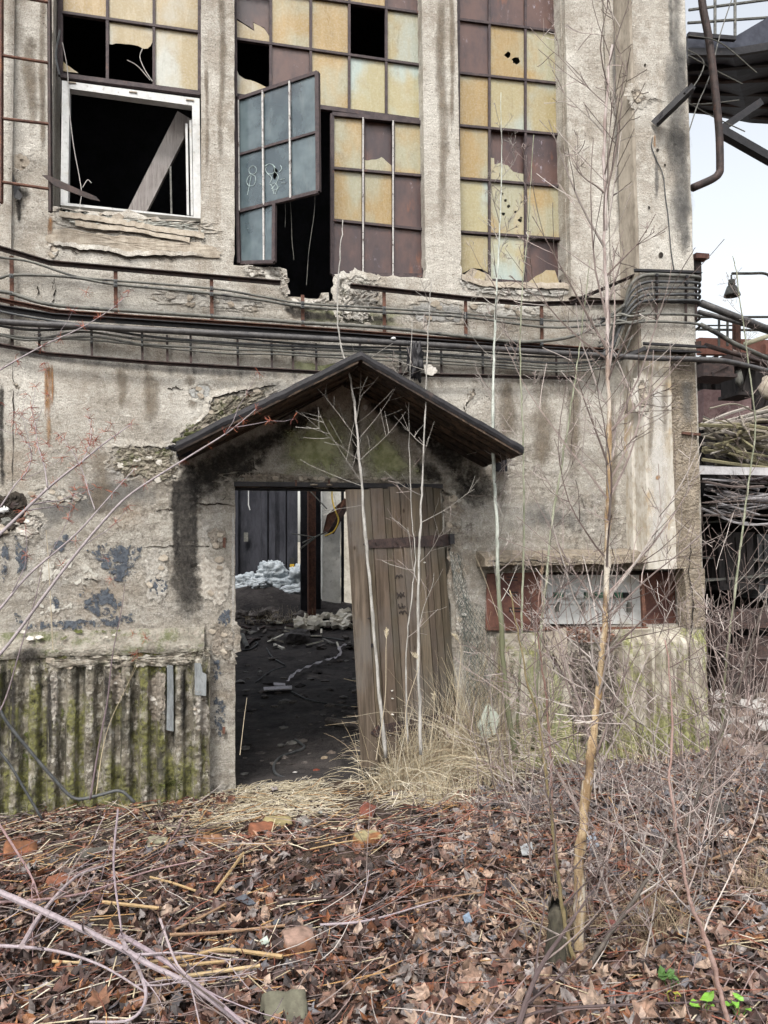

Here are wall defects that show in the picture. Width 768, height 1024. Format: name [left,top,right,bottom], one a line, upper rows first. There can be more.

leakage [668,0,690,246]
spalling [43,241,67,266]
flaking render [47,206,223,245]
spalling [242,265,388,331]
corrosion [45,367,54,437]
spalling [100,377,282,491]
spalling [0,482,169,641]
leakage [169,471,201,614]
spalling [35,519,241,729]